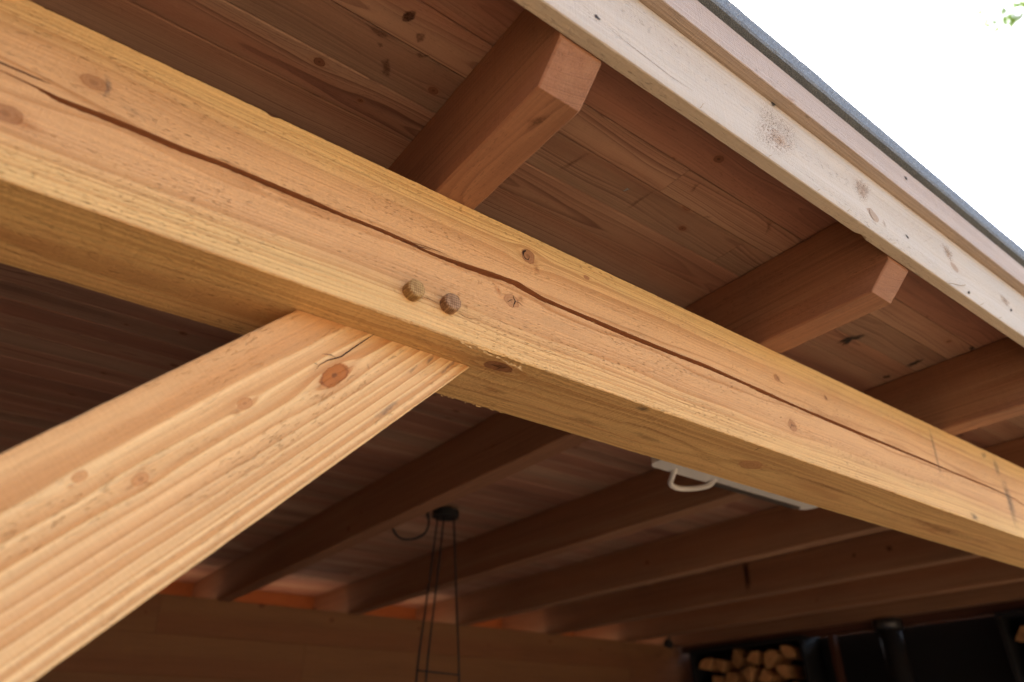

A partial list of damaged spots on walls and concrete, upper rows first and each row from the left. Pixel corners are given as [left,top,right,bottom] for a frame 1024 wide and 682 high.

crack [0,61,1023,505]